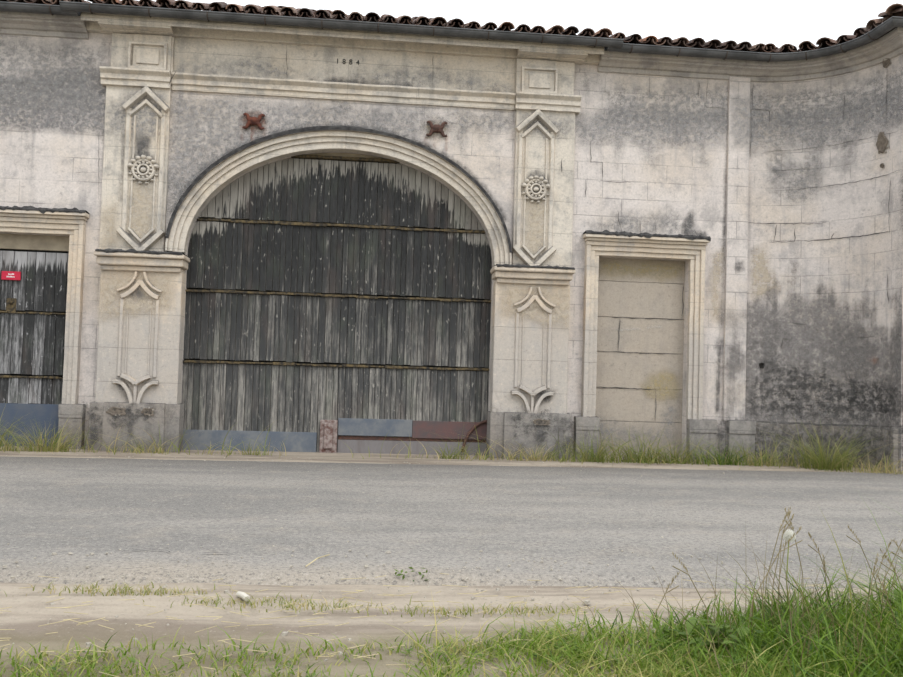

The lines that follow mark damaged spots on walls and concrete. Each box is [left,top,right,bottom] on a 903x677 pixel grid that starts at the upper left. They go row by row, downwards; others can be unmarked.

water stain [580,71,903,155]
spalling [876,132,889,168]
water stain [718,252,903,466]